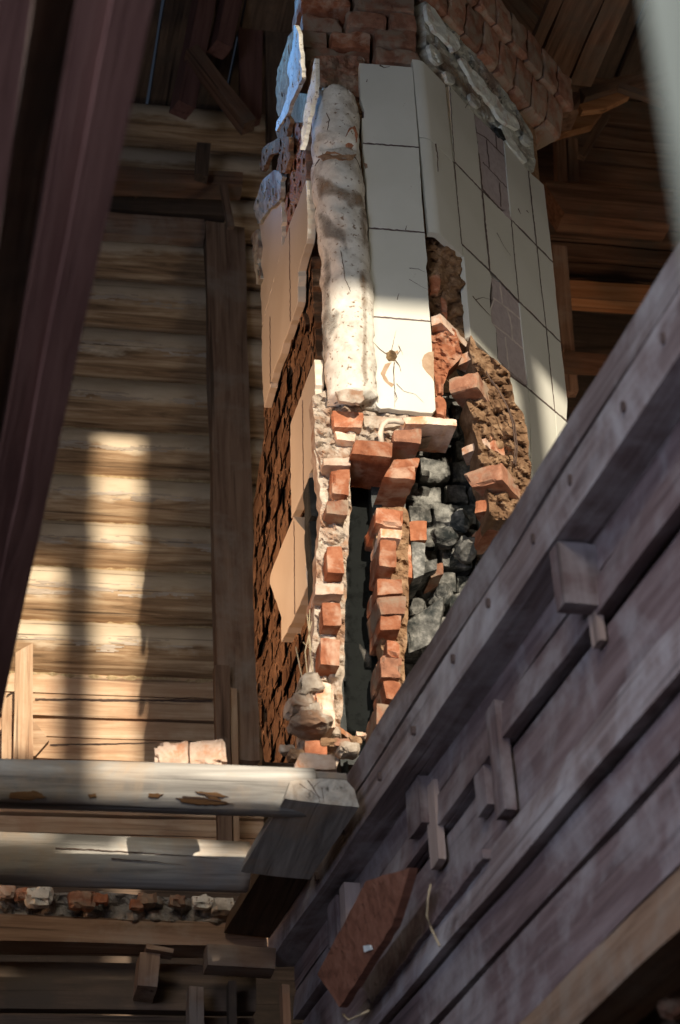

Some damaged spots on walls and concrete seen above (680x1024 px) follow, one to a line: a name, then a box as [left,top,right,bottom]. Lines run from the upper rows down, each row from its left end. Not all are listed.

flaking render [251,25,361,285]
flaking render [335,389,364,406]
crack [373,332,422,408]
spalling [490,278,527,386]